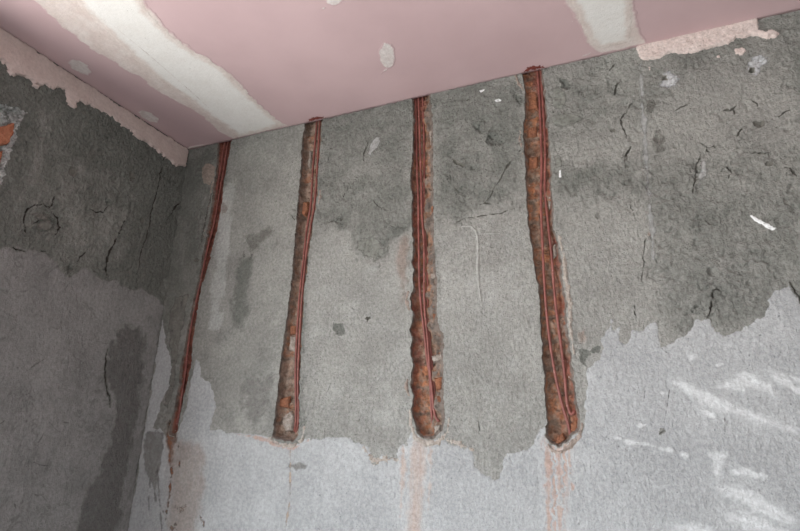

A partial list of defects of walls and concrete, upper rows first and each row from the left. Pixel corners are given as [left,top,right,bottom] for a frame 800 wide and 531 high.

flaking render [0,104,28,185]
crack [609,64,632,169]
crack [692,143,715,194]
crack [723,99,758,115]
crack [12,196,61,252]
crack [105,215,127,278]
crack [136,158,181,281]
crack [103,349,111,405]
corrosion [534,424,582,531]